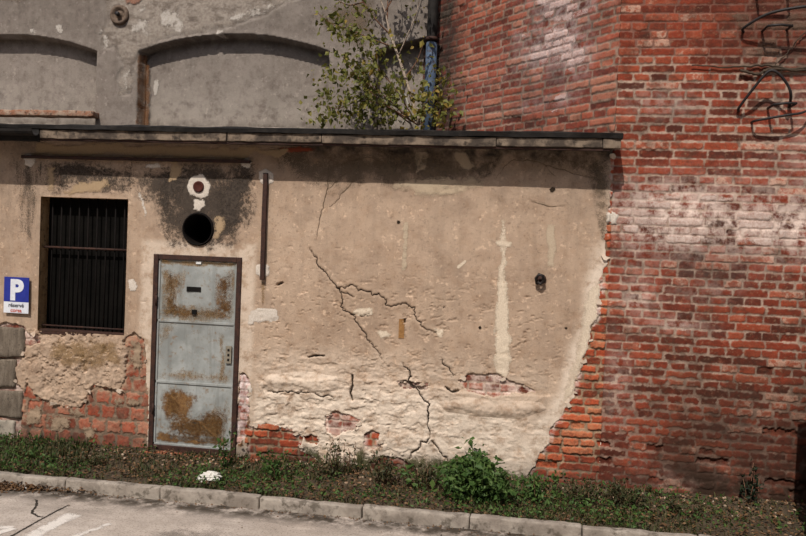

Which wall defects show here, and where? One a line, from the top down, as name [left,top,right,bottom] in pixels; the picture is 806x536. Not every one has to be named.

corrosion [135,54,150,125]
water stain [278,148,499,192]
water stain [543,155,609,240]
crack [312,155,427,353]
water stain [492,220,512,378]
spalling [527,153,616,486]
spalling [0,322,149,448]
spalling [236,373,417,471]
crack [398,364,447,458]
spalling [446,373,535,397]